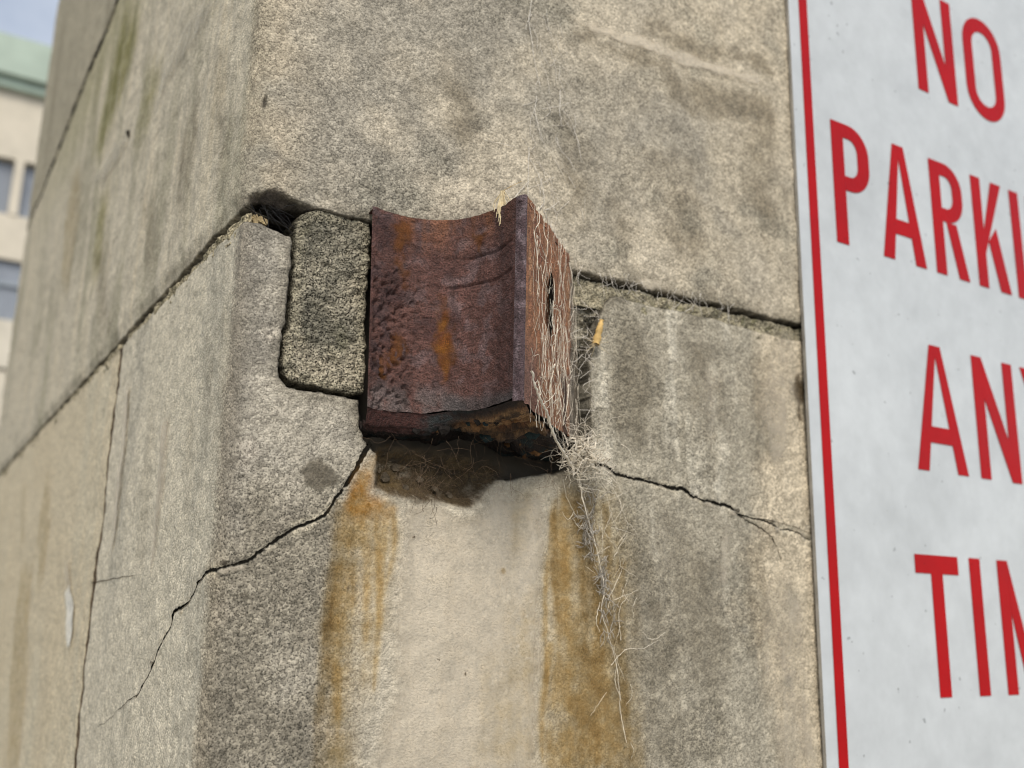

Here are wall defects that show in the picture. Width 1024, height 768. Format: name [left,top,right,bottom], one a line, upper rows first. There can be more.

rust [348,471,384,515]
crack [594,462,811,559]
crack [98,441,372,727]